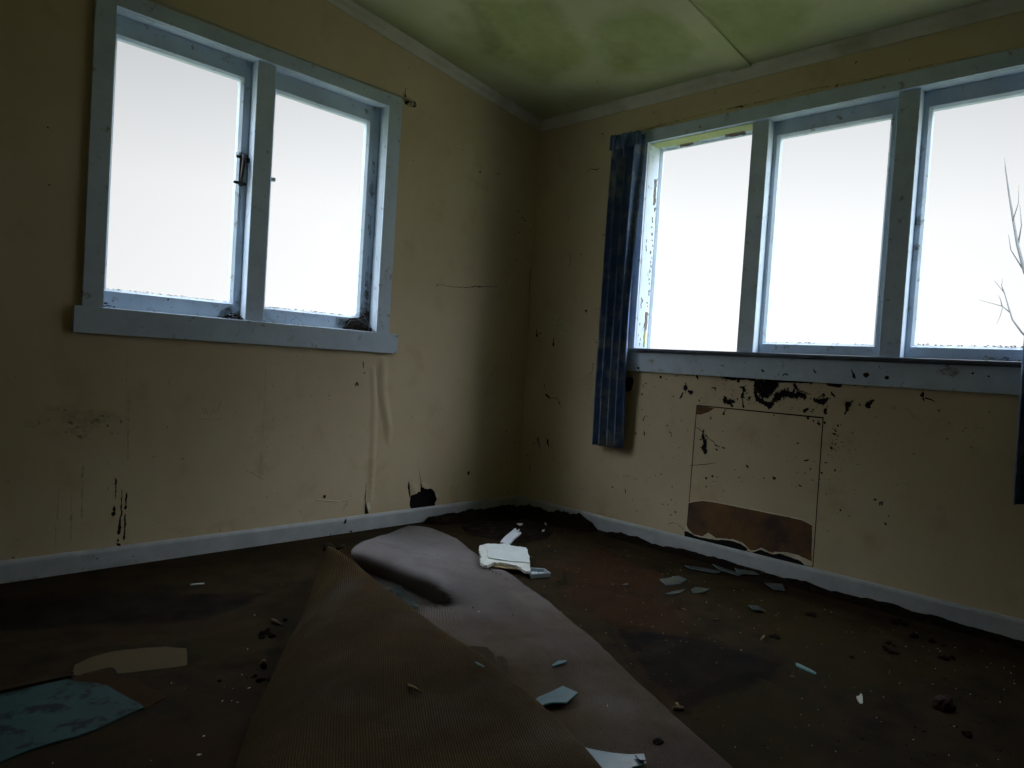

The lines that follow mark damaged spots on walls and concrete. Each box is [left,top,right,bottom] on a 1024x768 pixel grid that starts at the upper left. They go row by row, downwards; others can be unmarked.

peeling [696,406,714,415]
leakage [696,365,879,496]
spalling [408,472,439,508]
peeling [686,500,812,565]